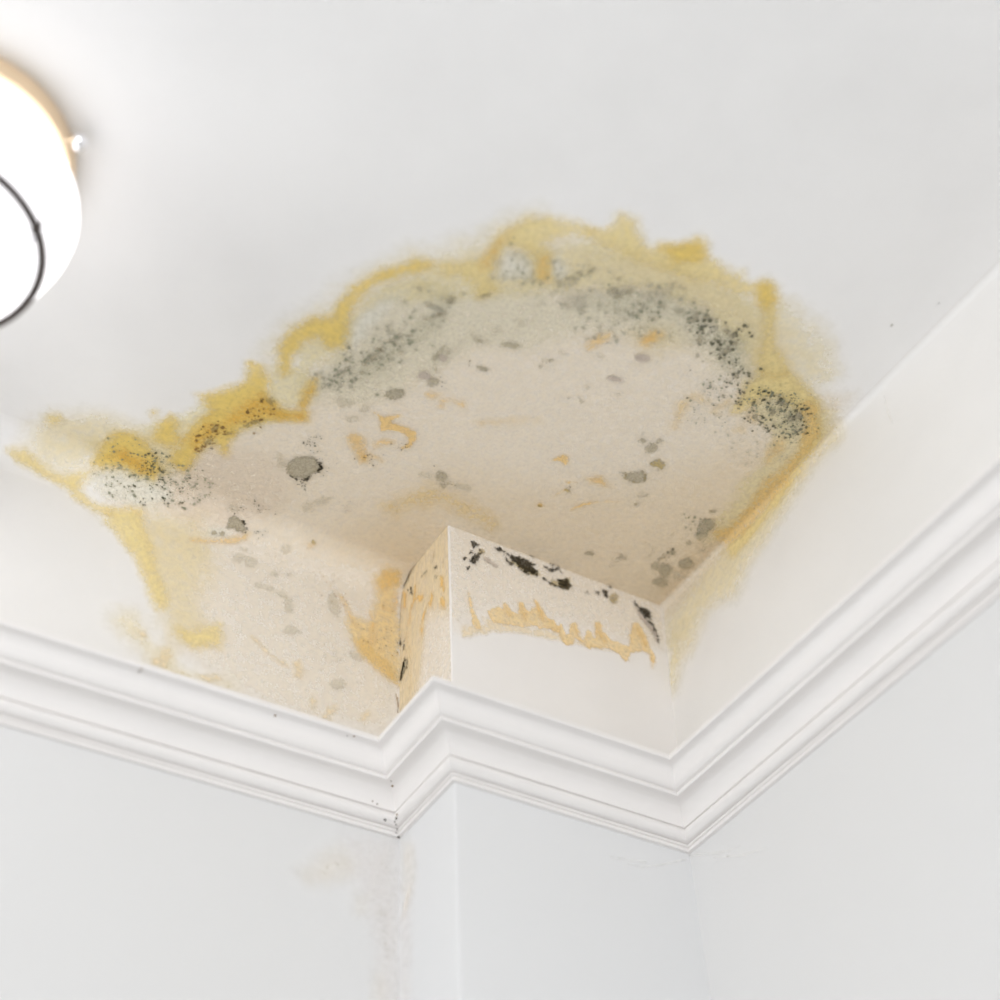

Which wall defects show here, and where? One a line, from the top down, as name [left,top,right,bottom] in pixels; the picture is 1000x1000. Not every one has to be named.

damp [11,217,825,710]